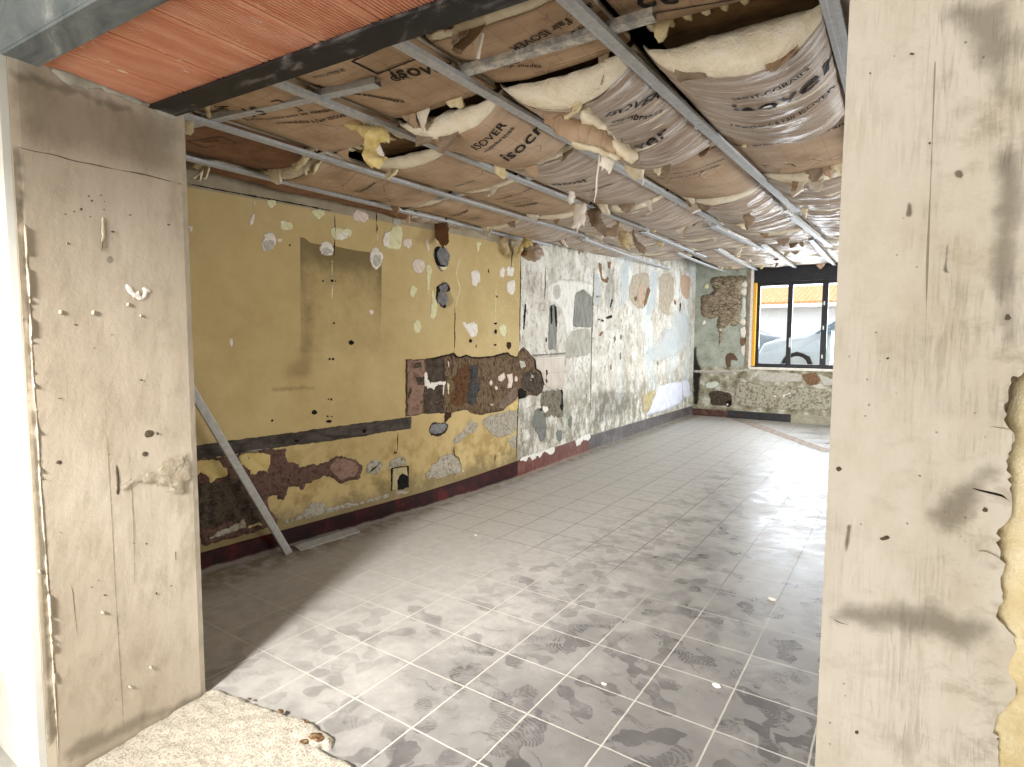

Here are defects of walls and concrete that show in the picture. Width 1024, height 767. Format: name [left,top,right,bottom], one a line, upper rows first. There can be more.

peeling [319,227,352,256]
peeling [370,218,425,273]
peeling [471,266,515,295]
spalling [545,290,622,370]
spalling [629,273,747,346]
spalling [405,322,555,479]
spalling [802,372,820,385]
spalling [109,448,409,546]